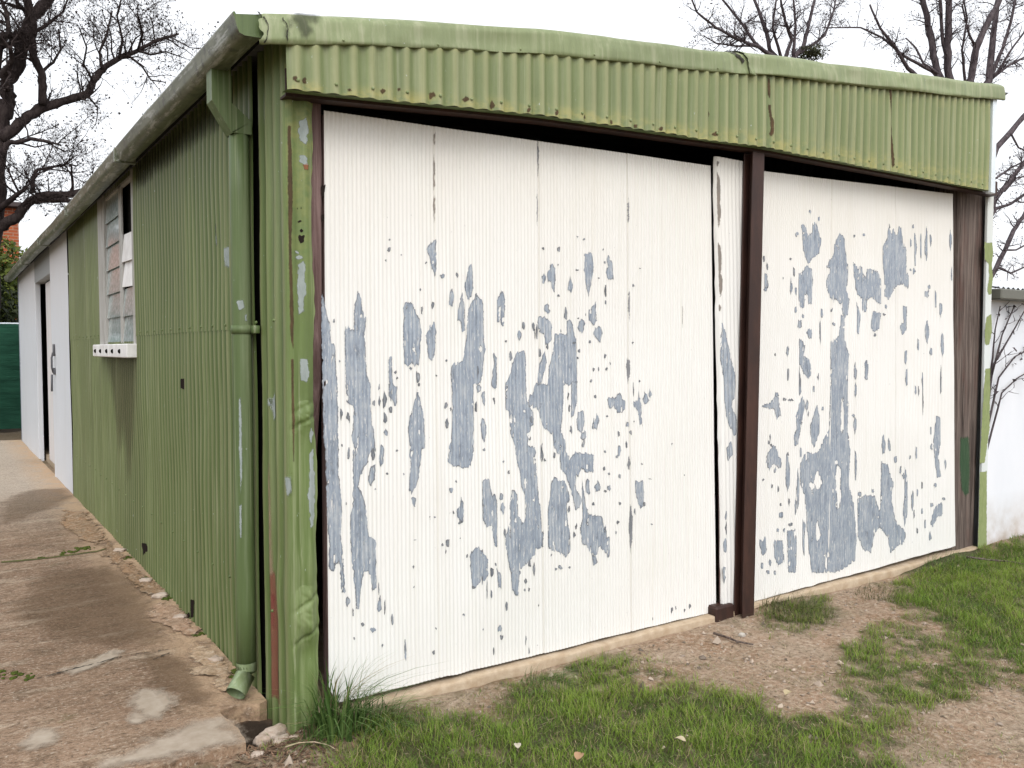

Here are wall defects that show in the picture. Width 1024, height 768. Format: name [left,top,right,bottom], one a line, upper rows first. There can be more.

peeling [298,118,309,165]
peeling [295,251,306,314]
peeling [307,240,652,633]
peeling [720,323,737,461]
peeling [759,210,946,575]
corrosion [269,511,279,701]